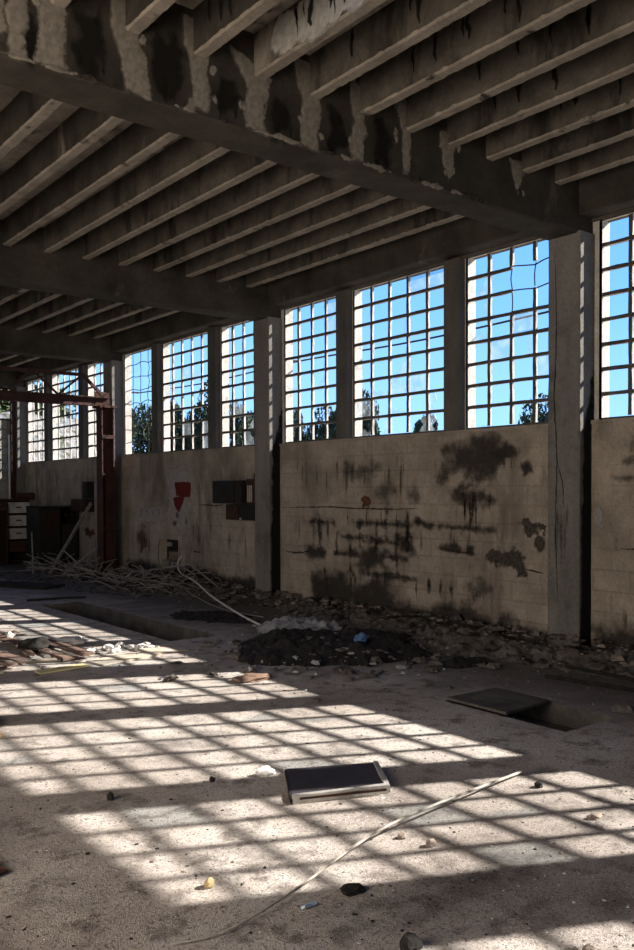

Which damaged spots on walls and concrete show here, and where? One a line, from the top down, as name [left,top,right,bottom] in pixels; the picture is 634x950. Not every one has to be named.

peeling [0,0,152,101]
peeling [175,13,217,113]
leakage [293,0,313,37]
peeling [230,0,391,173]
leakage [270,410,548,645]